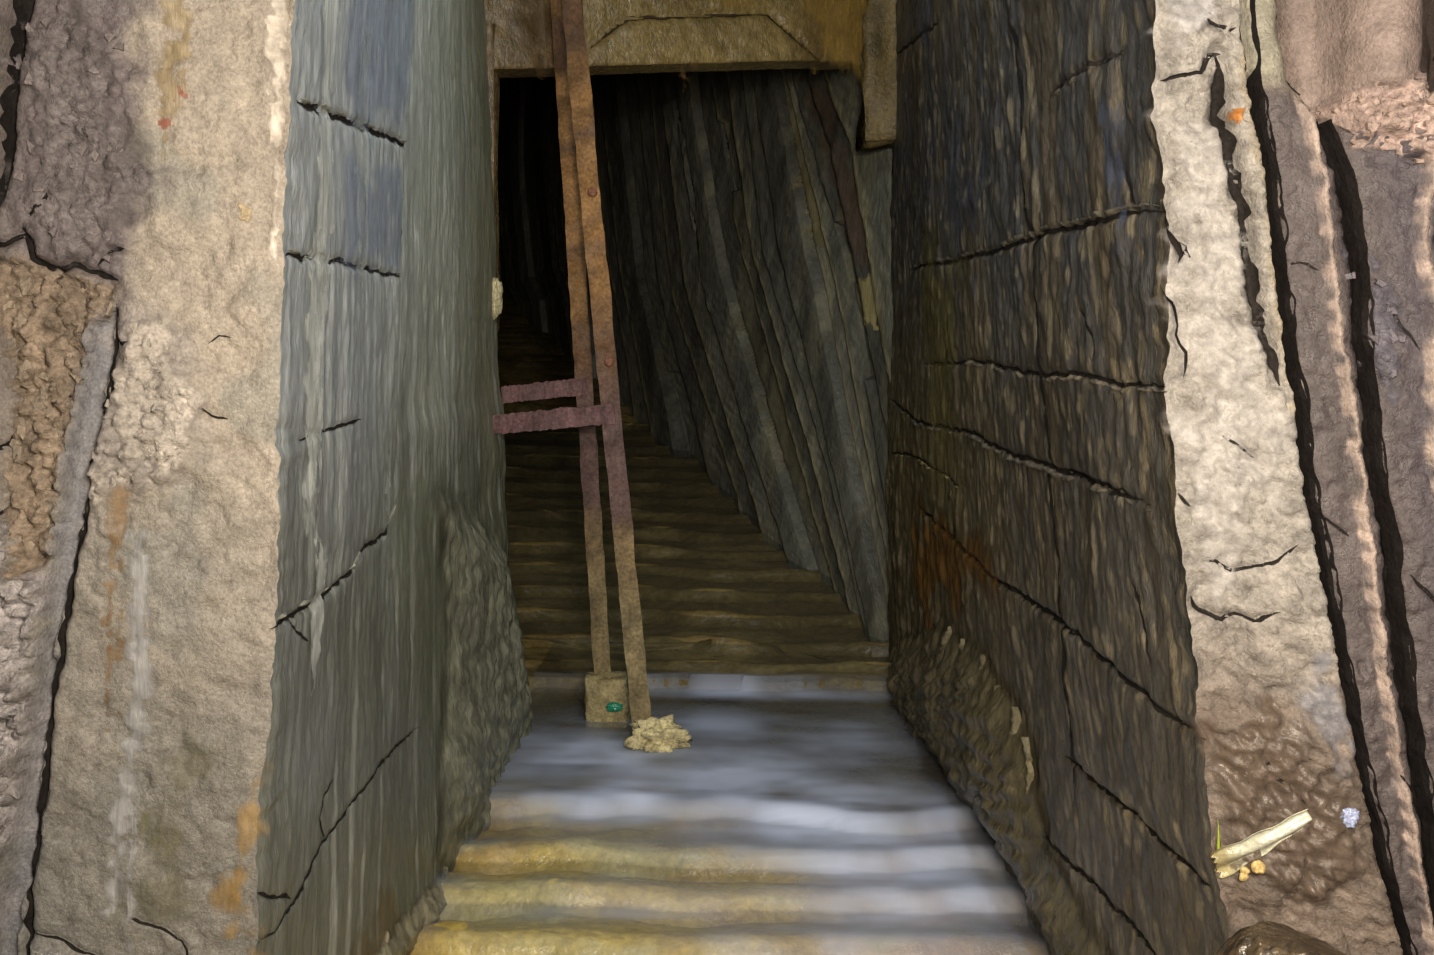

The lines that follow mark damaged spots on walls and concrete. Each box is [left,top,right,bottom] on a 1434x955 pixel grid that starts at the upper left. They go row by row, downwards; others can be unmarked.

spalling [1313,73,1434,164]
crack [0,0,127,955]
peeling [0,4,152,854]
crack [888,0,1210,886]
crack [1160,0,1434,955]
water stain [101,531,153,953]
crack [128,917,189,955]
crack [258,727,419,943]
crack [1044,834,1156,955]